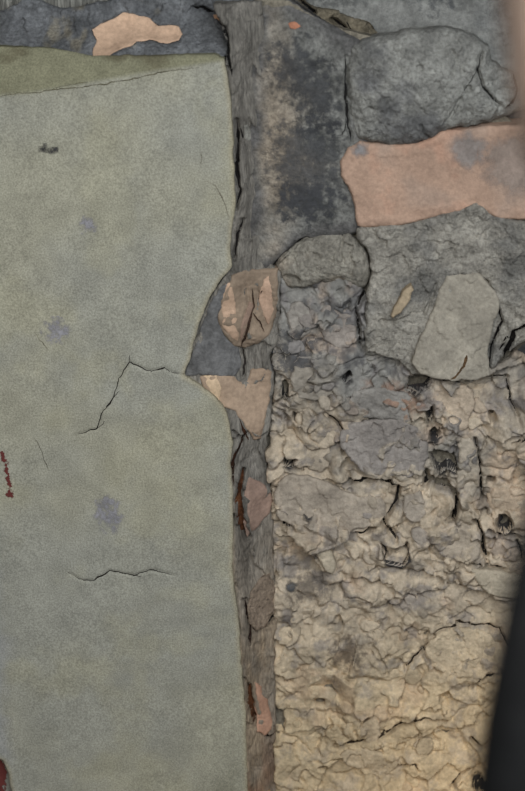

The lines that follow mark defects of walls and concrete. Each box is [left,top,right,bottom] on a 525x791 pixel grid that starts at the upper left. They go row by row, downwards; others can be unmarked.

crack [79,355,186,434]
spalling [185,0,525,791]
crack [68,569,173,581]
crack [436,620,498,632]
crack [347,717,432,744]